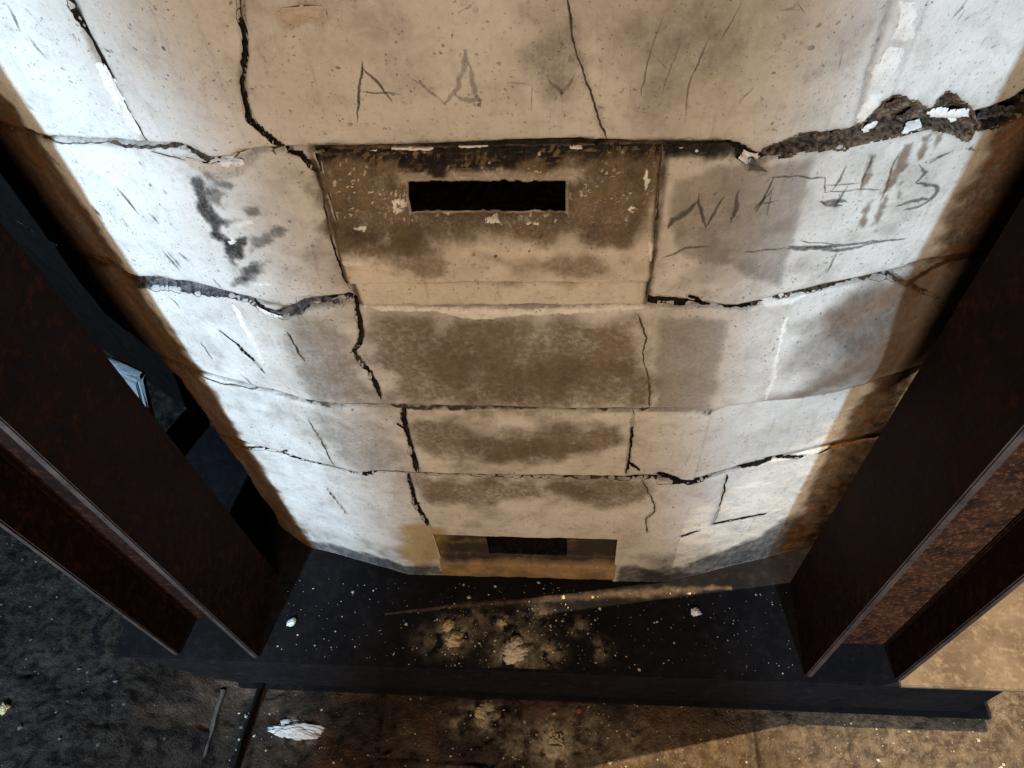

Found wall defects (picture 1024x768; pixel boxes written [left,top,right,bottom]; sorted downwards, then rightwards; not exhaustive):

crack [67,0,147,140]
crack [236,0,429,526]
peeling [391,143,434,153]
damp [317,141,661,277]
crack [567,0,607,139]
spalling [738,1,1024,164]
crack [220,331,265,374]
damp [378,319,651,407]
damp [413,422,619,462]
crack [681,445,831,537]